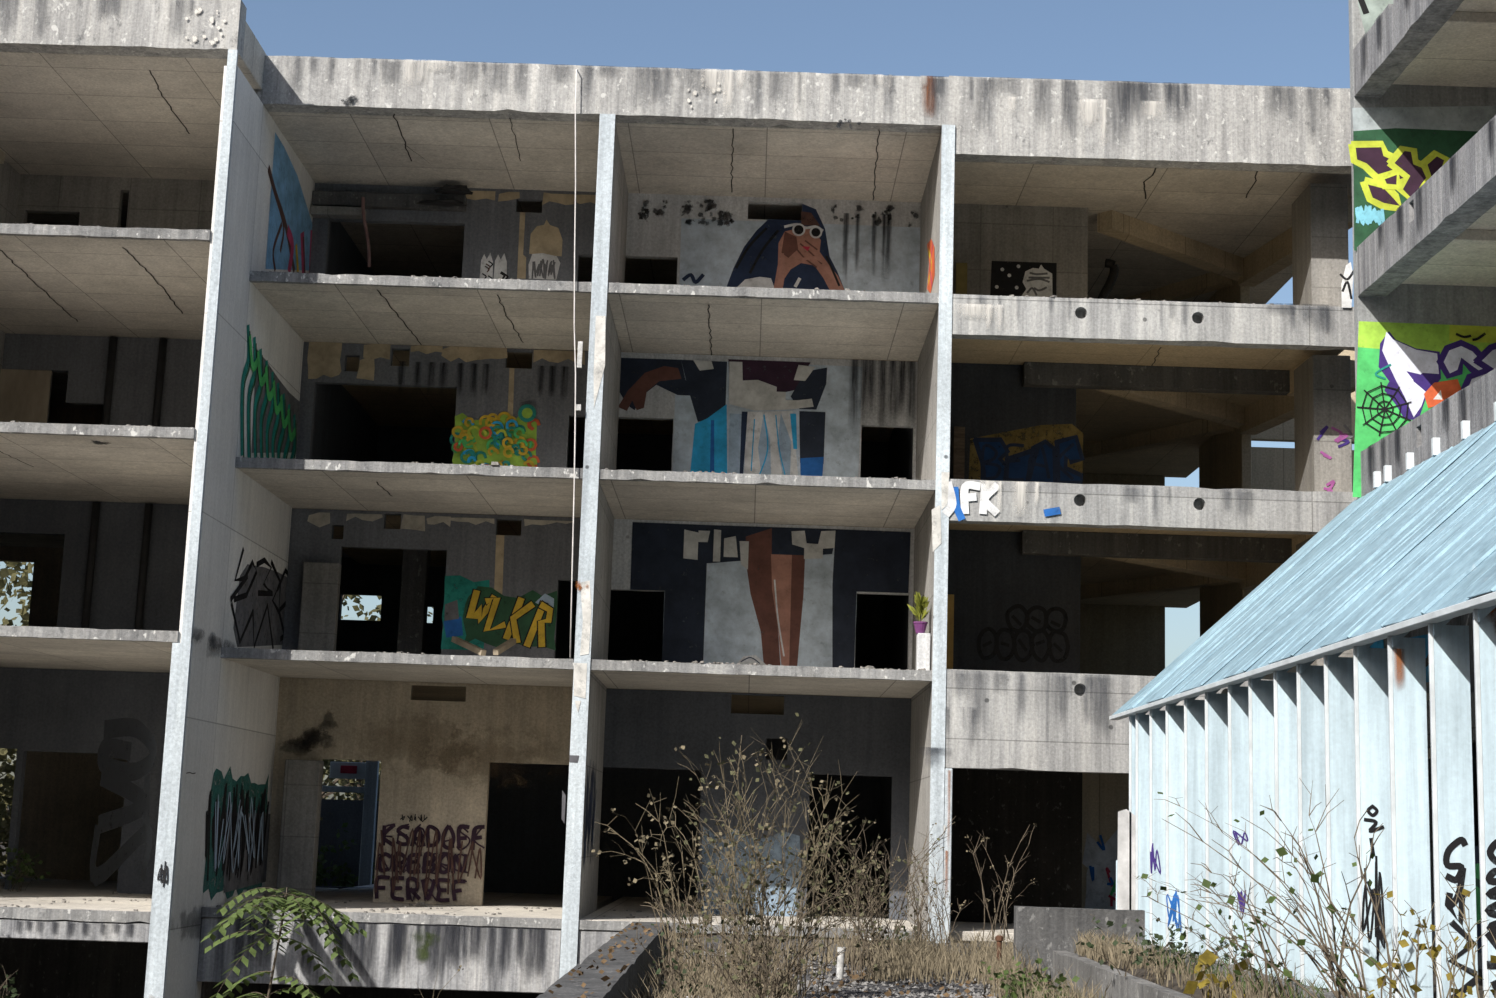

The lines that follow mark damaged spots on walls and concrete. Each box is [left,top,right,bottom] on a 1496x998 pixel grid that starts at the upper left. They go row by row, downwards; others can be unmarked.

crack [149,70,190,134]
water stain [687,69,742,108]
crack [393,114,430,164]
water stain [831,205,918,266]
crack [0,250,78,322]
crack [122,247,183,314]
peeling [307,342,391,381]
peeling [411,346,514,416]
peeling [533,316,606,405]
water stain [852,359,915,416]
peeling [400,514,504,594]
water stain [302,921,545,968]